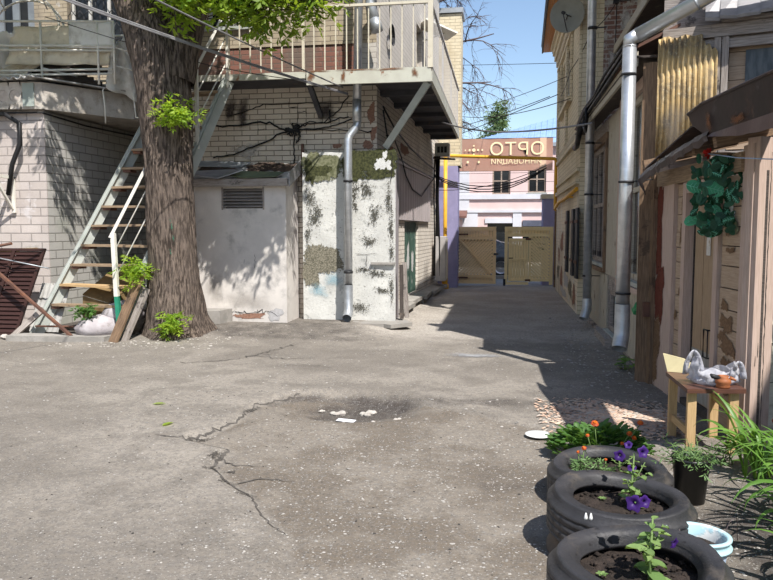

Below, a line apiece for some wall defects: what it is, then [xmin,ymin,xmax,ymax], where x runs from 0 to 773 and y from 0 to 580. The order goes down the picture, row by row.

damp [300,148,398,185]
spalling [232,308,284,321]
peeling [718,298,736,366]
crack [185,393,300,534]